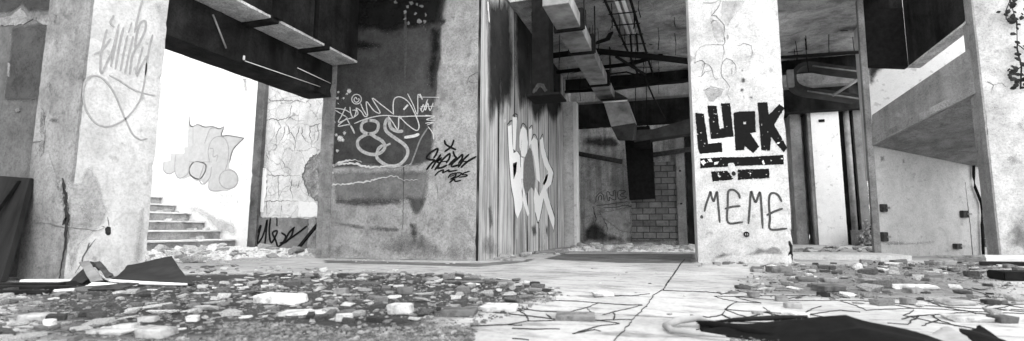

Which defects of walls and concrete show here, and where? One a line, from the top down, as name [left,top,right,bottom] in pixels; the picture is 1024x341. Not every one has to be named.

crack [697,1,753,100]
crack [265,99,322,214]
spalling [302,152,417,201]
crack [40,178,109,278]
crack [470,259,1024,341]